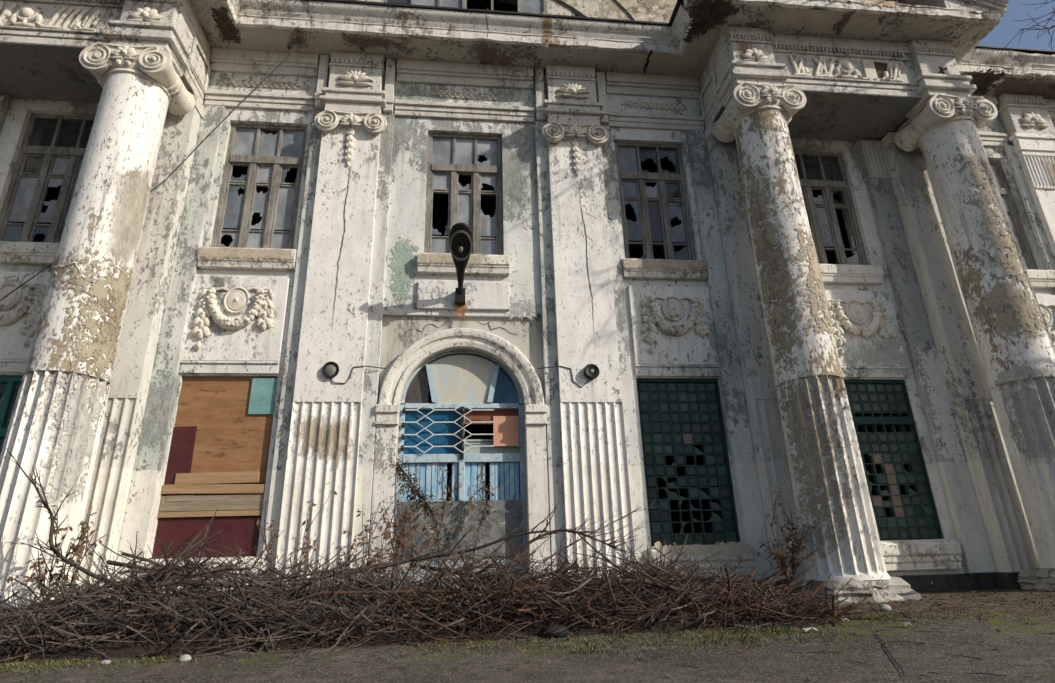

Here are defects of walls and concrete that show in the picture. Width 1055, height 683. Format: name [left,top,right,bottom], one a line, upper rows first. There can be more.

crack [642,50,653,74]
flaking render [873,61,888,78]
crack [332,166,351,328]
crack [579,186,594,330]
peeling [961,153,1049,346]
peeling [35,254,133,509]
peeling [743,162,966,558]
peeling [994,360,1055,471]